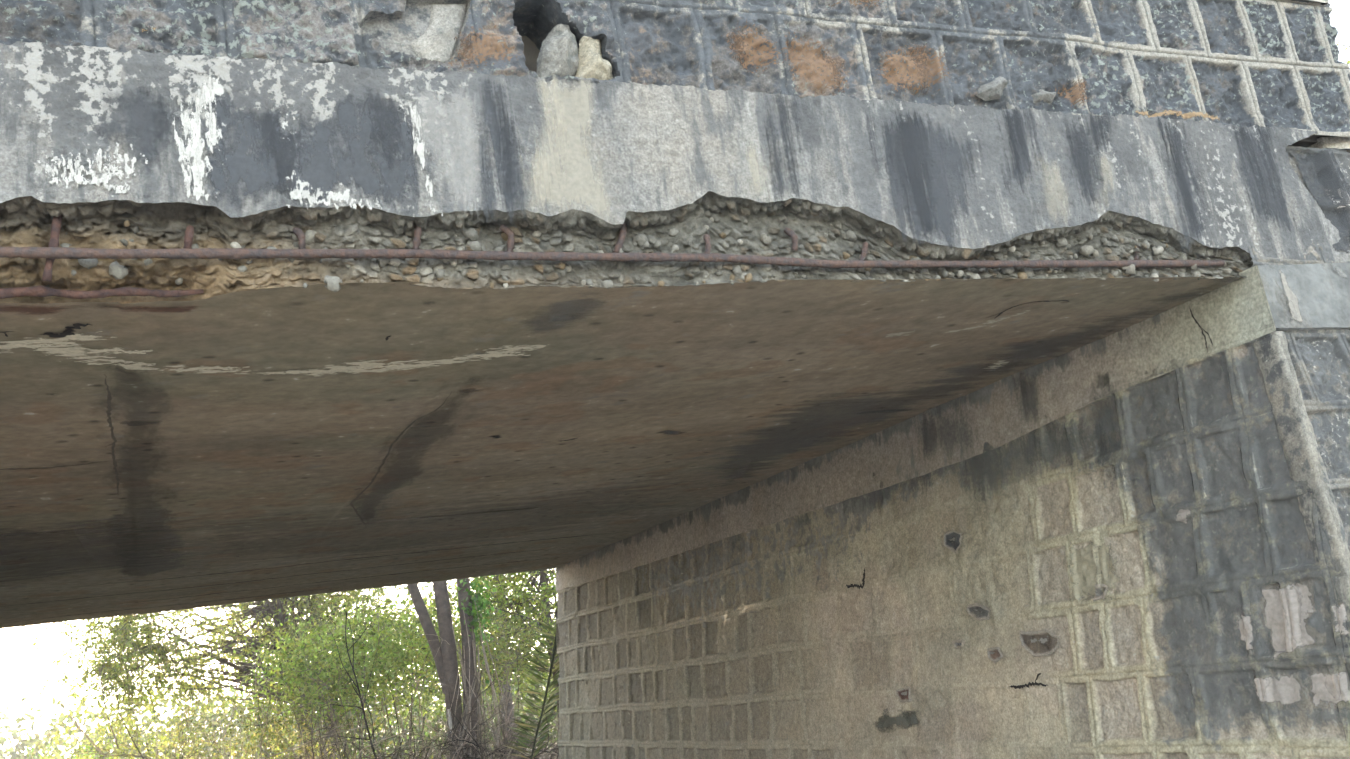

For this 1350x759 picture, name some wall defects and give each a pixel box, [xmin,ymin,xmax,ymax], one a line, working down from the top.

damp [99,95,179,160]
damp [206,90,419,205]
spalling [0,76,1253,304]
damp [869,117,973,247]
damp [1003,107,1037,191]
damp [1065,111,1110,201]
damp [1159,121,1204,248]
spalling [1019,630,1061,657]